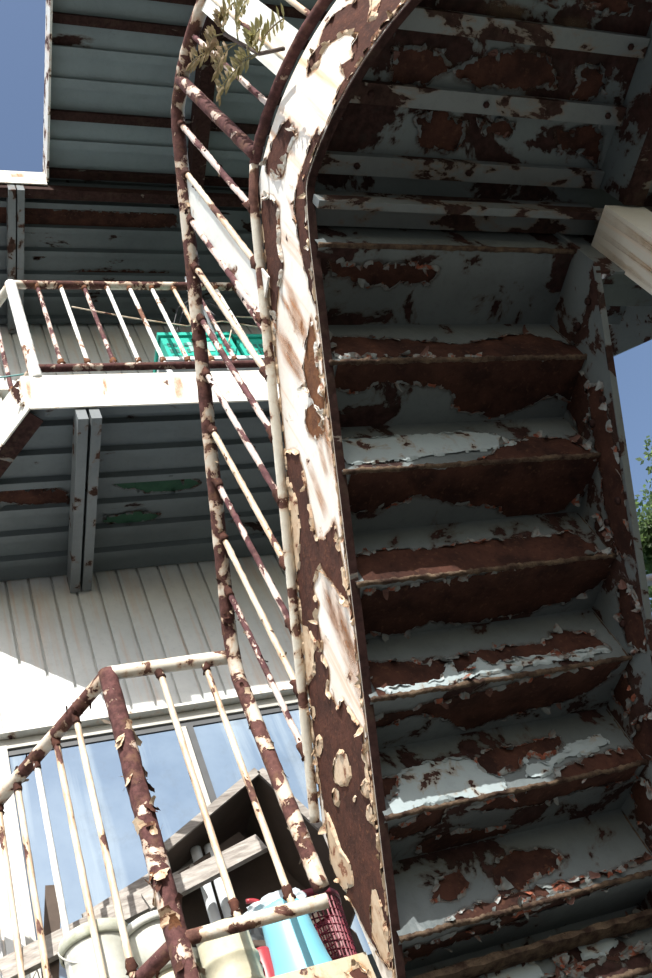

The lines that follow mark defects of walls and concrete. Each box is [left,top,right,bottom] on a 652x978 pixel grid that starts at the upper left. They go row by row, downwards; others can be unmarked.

peeling [259,0,652,978]
peeling [115,719,142,750]
peeling [119,766,163,835]
peeling [144,868,183,930]
peeling [174,960,206,975]